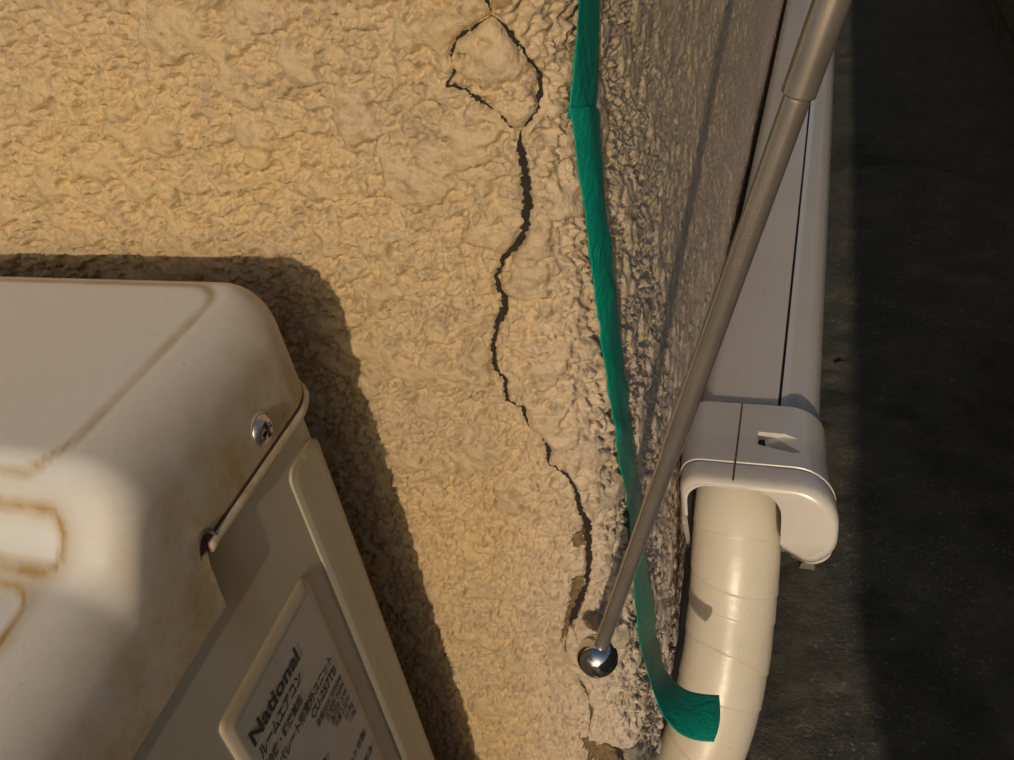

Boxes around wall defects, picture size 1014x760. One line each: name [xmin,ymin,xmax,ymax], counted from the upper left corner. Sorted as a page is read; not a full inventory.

crack [445,0,593,651]
crack [579,680,624,760]
spalling [578,735,660,760]